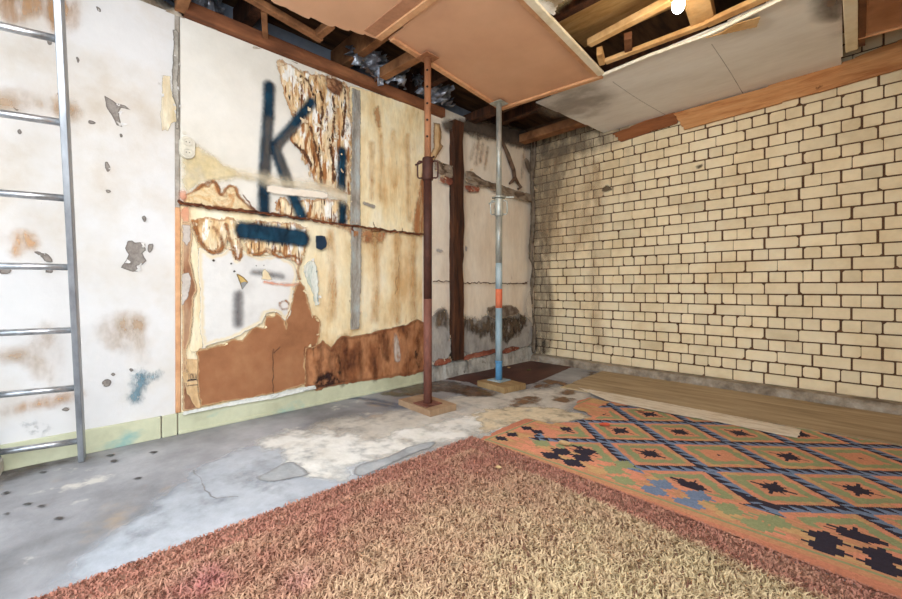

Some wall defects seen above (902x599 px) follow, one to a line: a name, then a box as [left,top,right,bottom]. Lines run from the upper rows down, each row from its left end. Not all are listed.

damp [820,0,842,19]
peeling [105,96,128,137]
peeling [255,59,453,236]
flaking render [465,169,532,203]
peeling [121,241,153,272]
damp [442,119,606,354]
peeling [181,217,321,415]
damp [436,310,448,327]
damp [304,316,494,408]